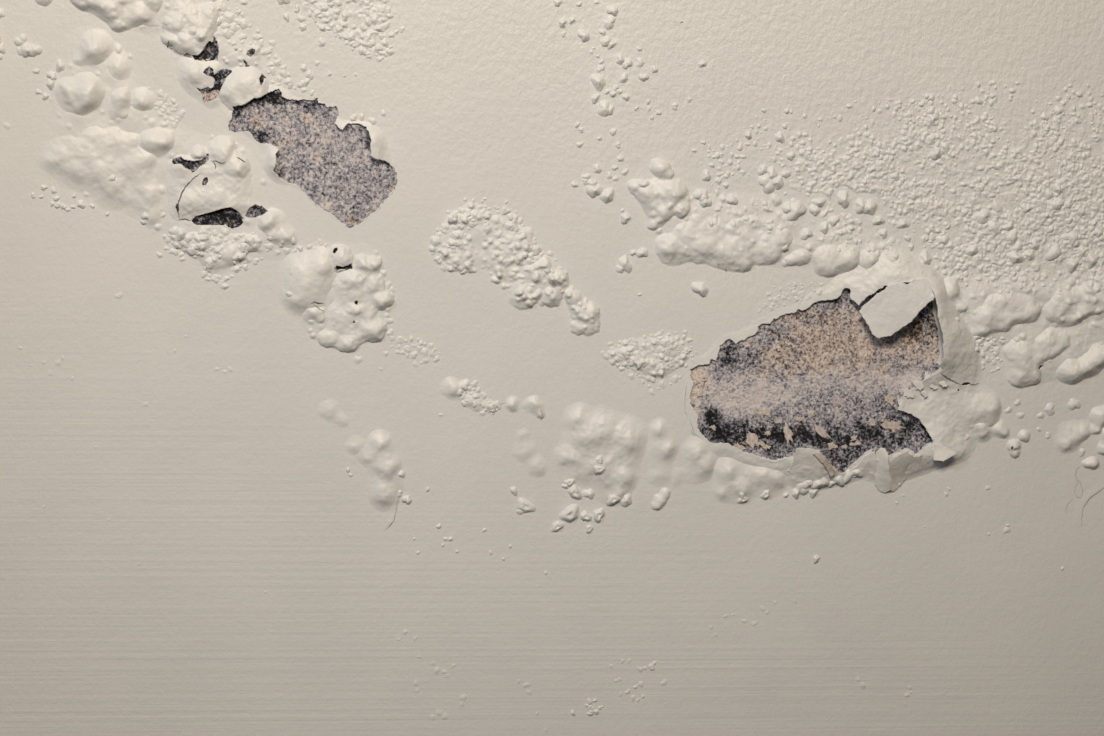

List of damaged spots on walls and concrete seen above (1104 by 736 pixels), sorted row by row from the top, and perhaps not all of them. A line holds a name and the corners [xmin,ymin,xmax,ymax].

peeling [227,84,398,228]
peeling [683,249,1002,493]